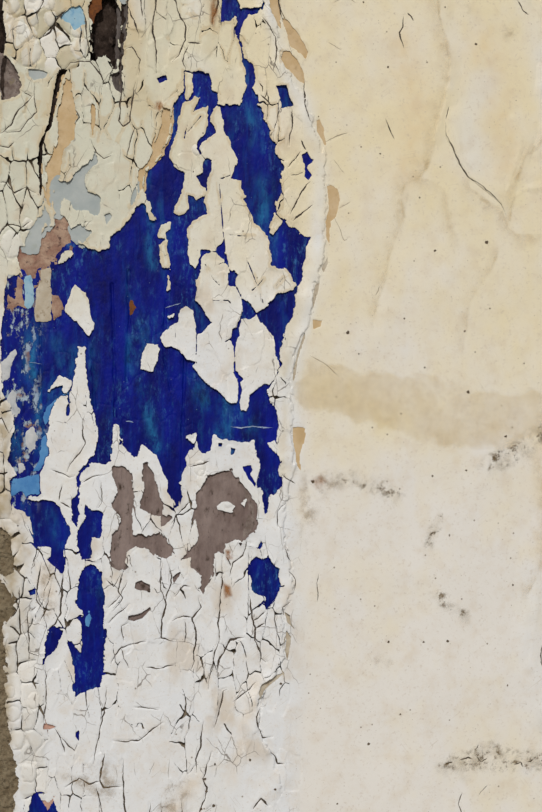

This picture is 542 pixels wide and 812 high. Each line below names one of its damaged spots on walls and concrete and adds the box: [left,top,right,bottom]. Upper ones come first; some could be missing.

crack [0,0,201,196]
peeling [302,152,313,180]
peeling [317,116,326,145]
crack [446,107,502,205]
peeling [0,0,311,700]
peeling [293,320,322,380]
spalling [0,527,19,812]
crack [13,567,161,812]
crack [108,542,296,812]
peeling [27,789,58,812]